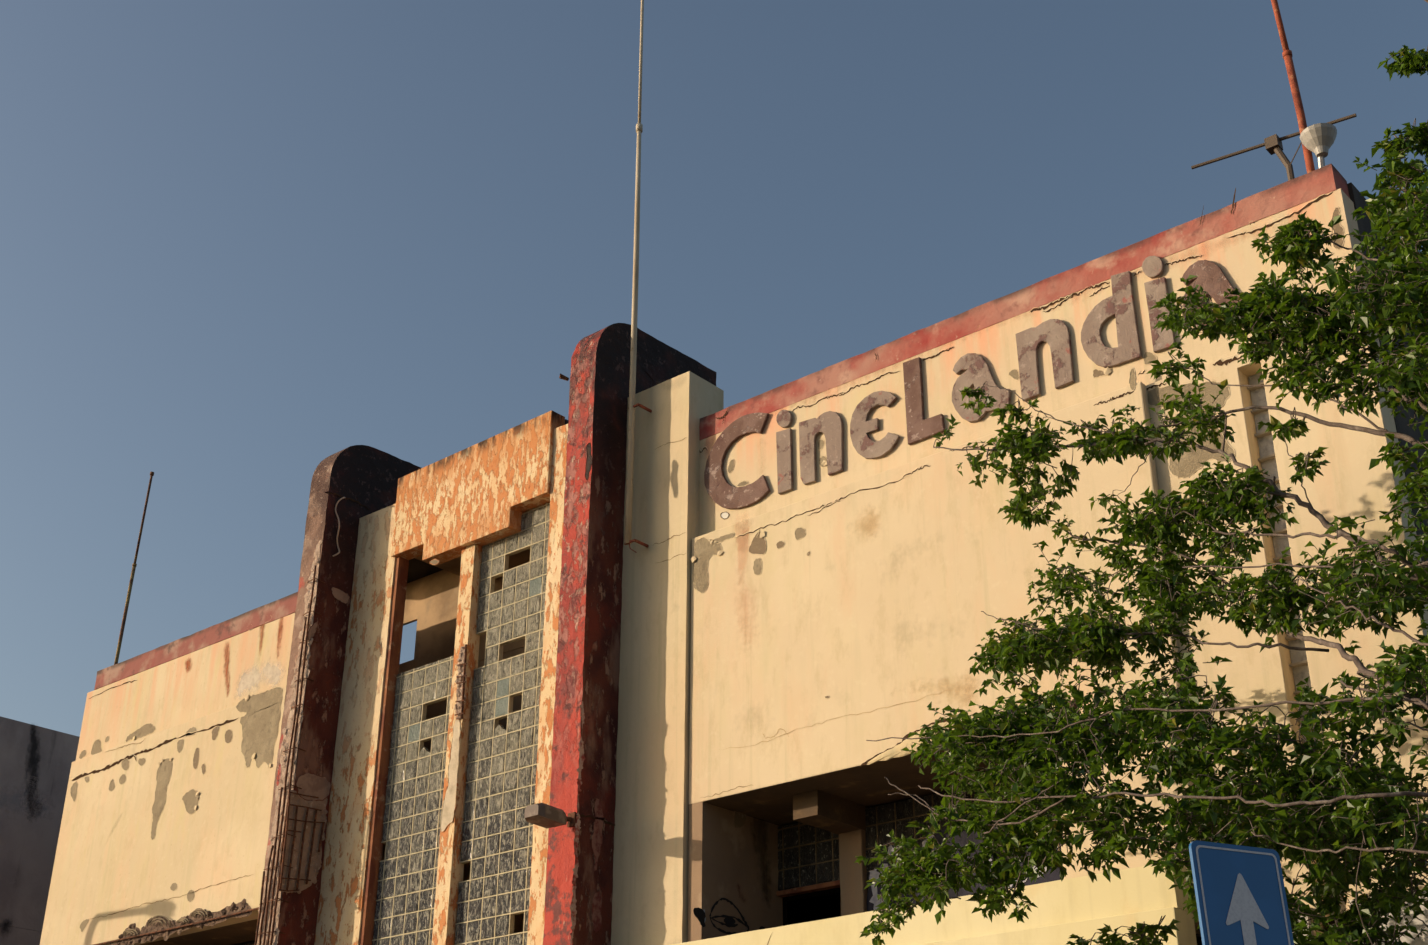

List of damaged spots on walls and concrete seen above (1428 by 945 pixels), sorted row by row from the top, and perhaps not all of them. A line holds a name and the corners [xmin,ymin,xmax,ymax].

crack [1029,188,1332,313]
crack [1213,354,1243,366]
flaking render [690,512,735,594]
flaking render [748,527,811,576]
water stain [26,726,41,817]
crack [72,702,280,781]
spalling [79,540,350,945]
crack [719,688,958,750]
spalling [570,701,604,945]